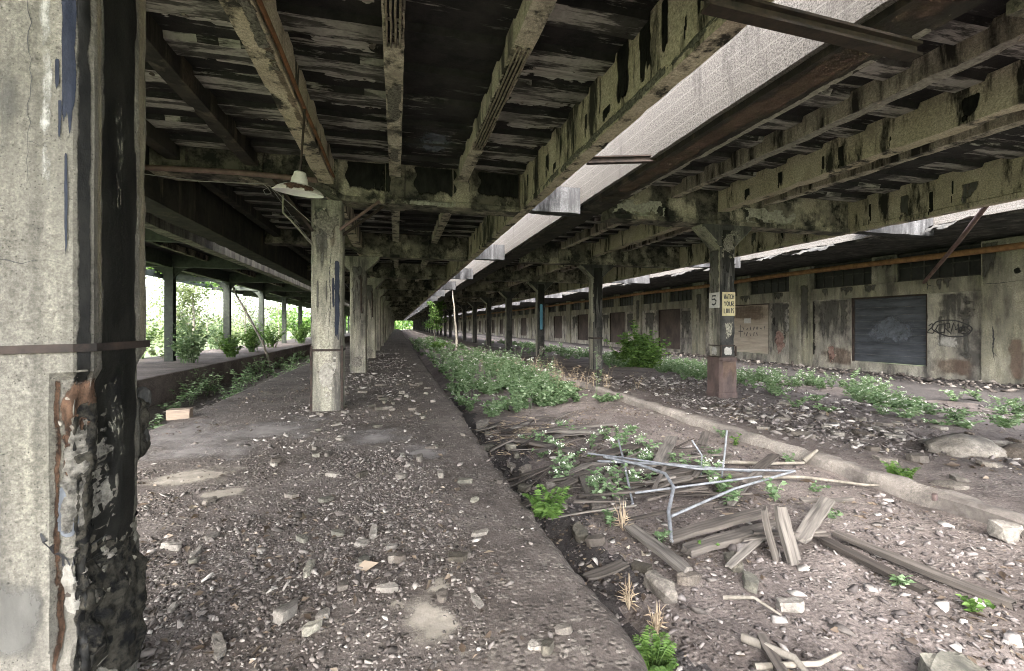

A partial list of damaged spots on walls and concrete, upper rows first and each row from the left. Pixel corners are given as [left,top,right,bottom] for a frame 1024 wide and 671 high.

peeling [162,13,233,27]
spalling [237,0,280,71]
spalling [311,0,404,53]
peeling [325,73,375,83]
water stain [478,0,668,199]
water stain [899,195,909,220]
water stain [951,181,978,203]
water stain [771,285,852,354]
water stain [936,278,972,359]
spalling [138,398,151,460]
rust [52,378,97,671]
spalling [57,397,148,671]